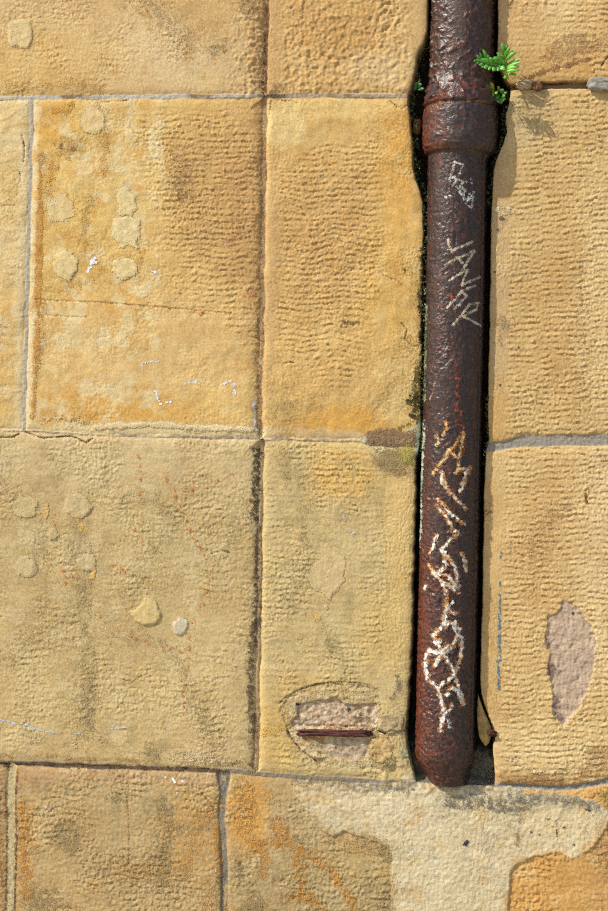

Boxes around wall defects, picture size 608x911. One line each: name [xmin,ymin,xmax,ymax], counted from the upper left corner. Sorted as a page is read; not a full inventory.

spalling [278,679,404,775]
spalling [542,598,598,728]